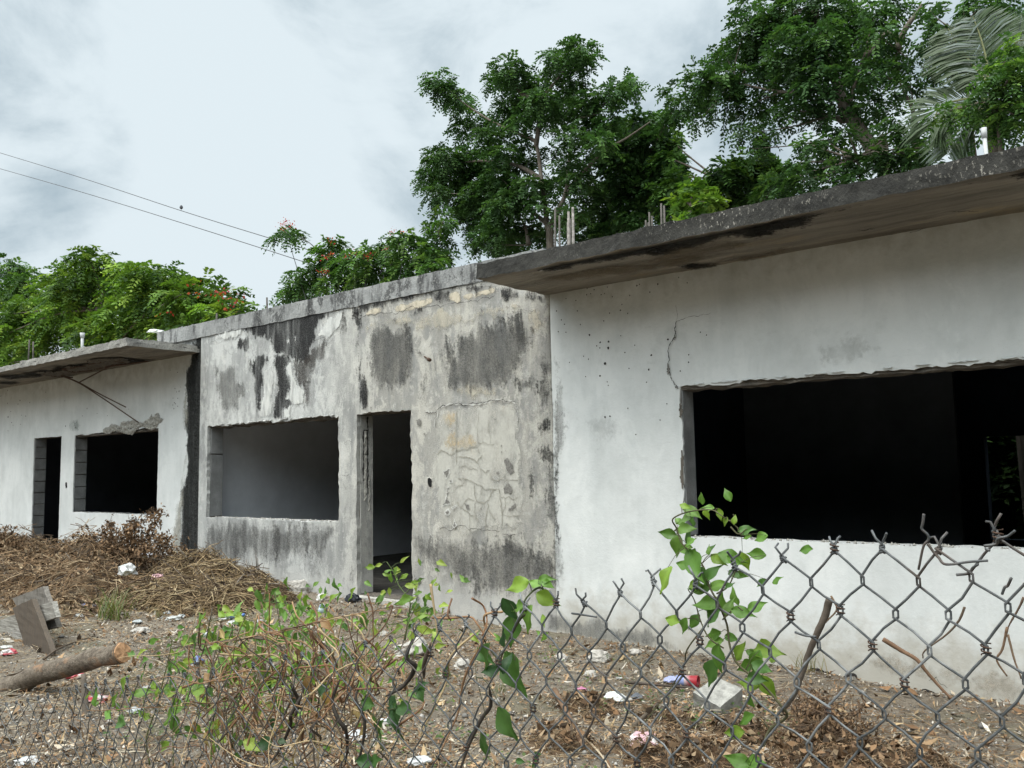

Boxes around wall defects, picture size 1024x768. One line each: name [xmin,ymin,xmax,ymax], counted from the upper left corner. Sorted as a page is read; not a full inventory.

damp [537,214,821,281]
spalling [35,358,163,435]
damp [216,313,329,418]
damp [340,295,422,409]
peeling [390,287,494,330]
damp [444,311,548,396]
damp [466,284,542,302]
crack [668,309,707,389]
damp [172,338,329,559]
crack [425,399,523,536]
damp [414,416,560,593]